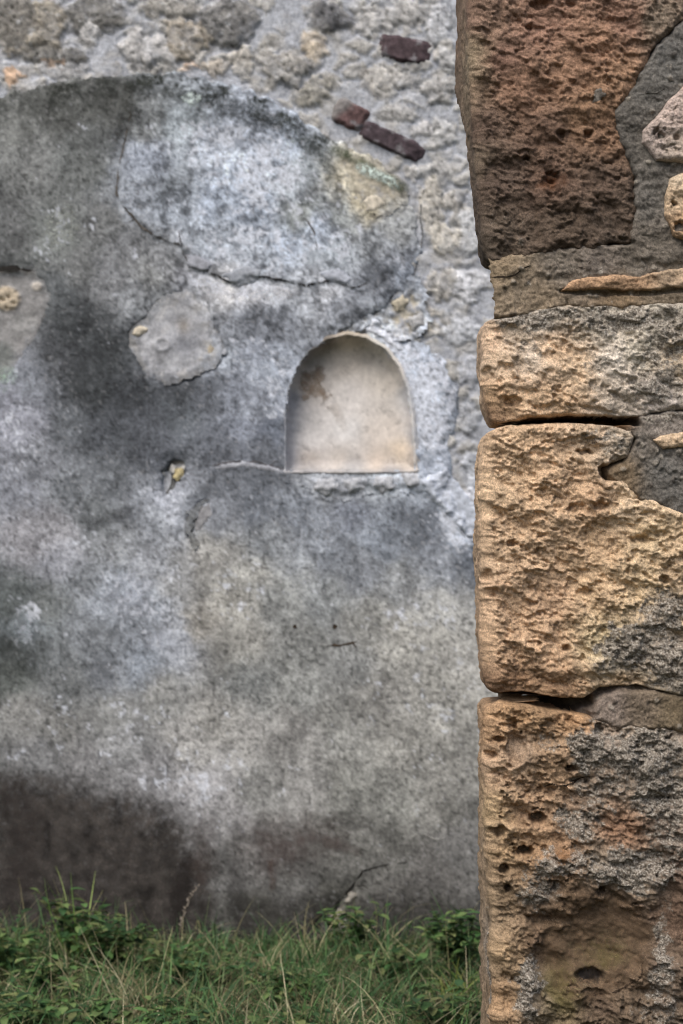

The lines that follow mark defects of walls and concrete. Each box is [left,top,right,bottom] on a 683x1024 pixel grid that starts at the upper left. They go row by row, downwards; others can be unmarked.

crack [113,106,179,245]
spalling [328,141,408,217]
flaking render [179,234,367,288]
spalling [0,265,51,381]
spalling [128,289,228,385]
spalling [339,274,434,351]
spalling [162,460,186,494]
leakage [0,774,212,941]
crack [312,861,407,924]